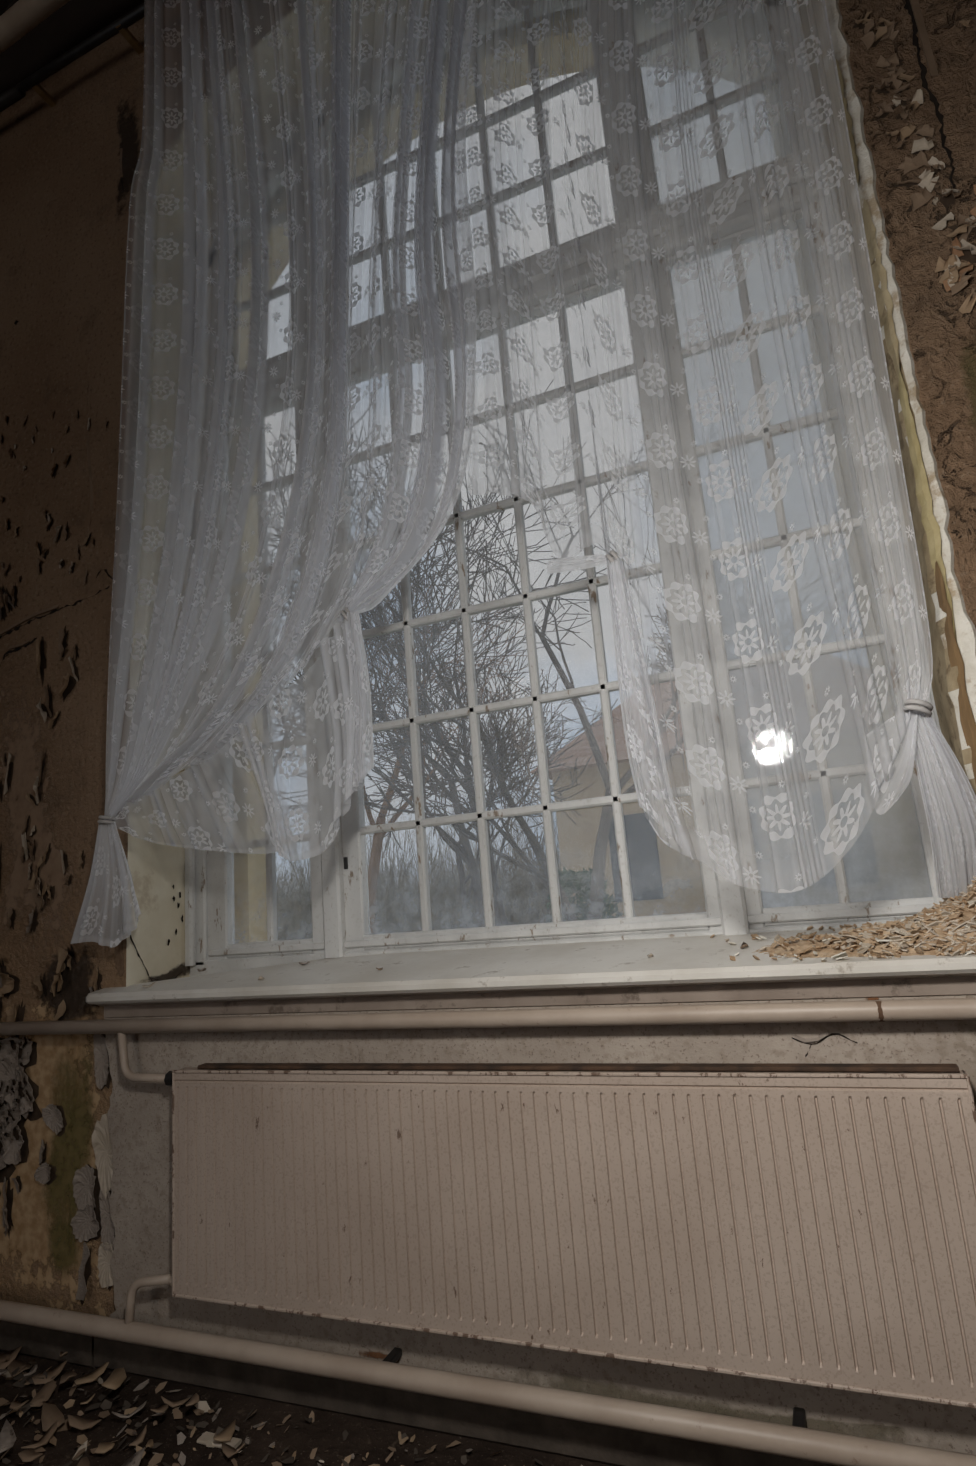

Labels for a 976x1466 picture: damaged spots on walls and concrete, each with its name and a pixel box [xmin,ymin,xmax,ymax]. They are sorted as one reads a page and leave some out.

crack [904,0,956,189]
flaking render [797,0,976,795]
peeling [0,508,95,621]
peeling [36,626,79,729]
peeling [0,749,86,934]
peeling [0,912,124,1317]